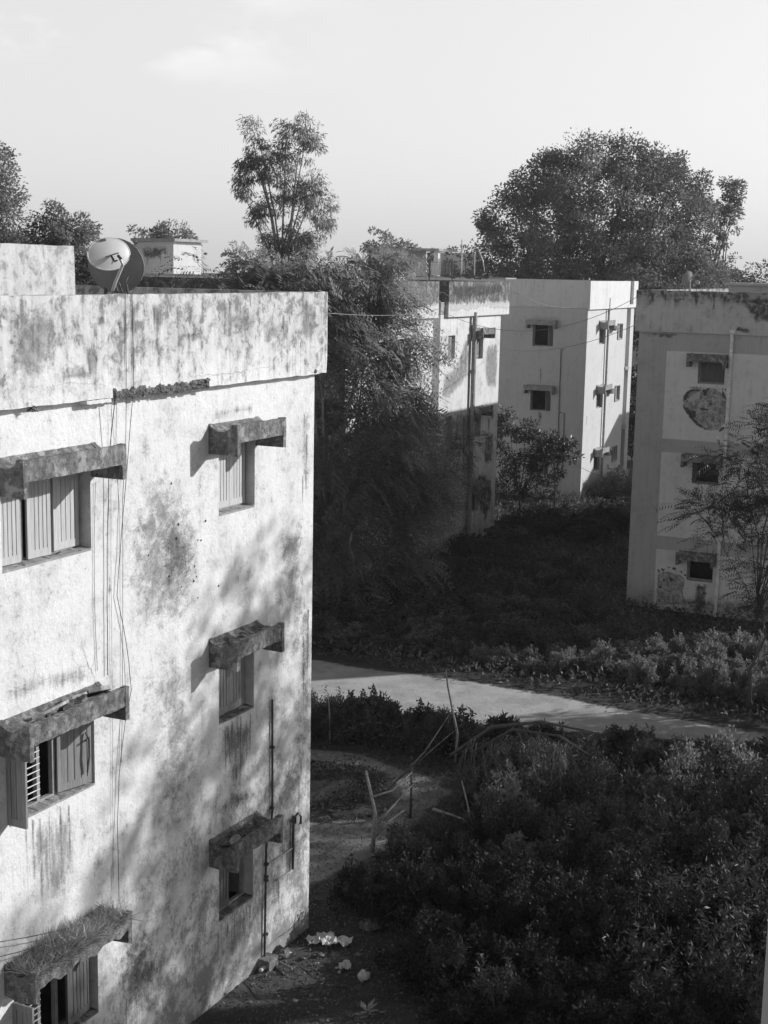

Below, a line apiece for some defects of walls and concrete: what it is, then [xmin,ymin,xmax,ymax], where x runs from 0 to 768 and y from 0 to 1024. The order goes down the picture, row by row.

water stain [14,314,67,374]
water stain [64,349,97,377]
water stain [120,307,138,362]
water stain [154,305,163,361]
flaking render [683,388,726,432]
peeling [656,567,686,605]
water stain [225,714,251,778]
water stain [26,806,71,895]